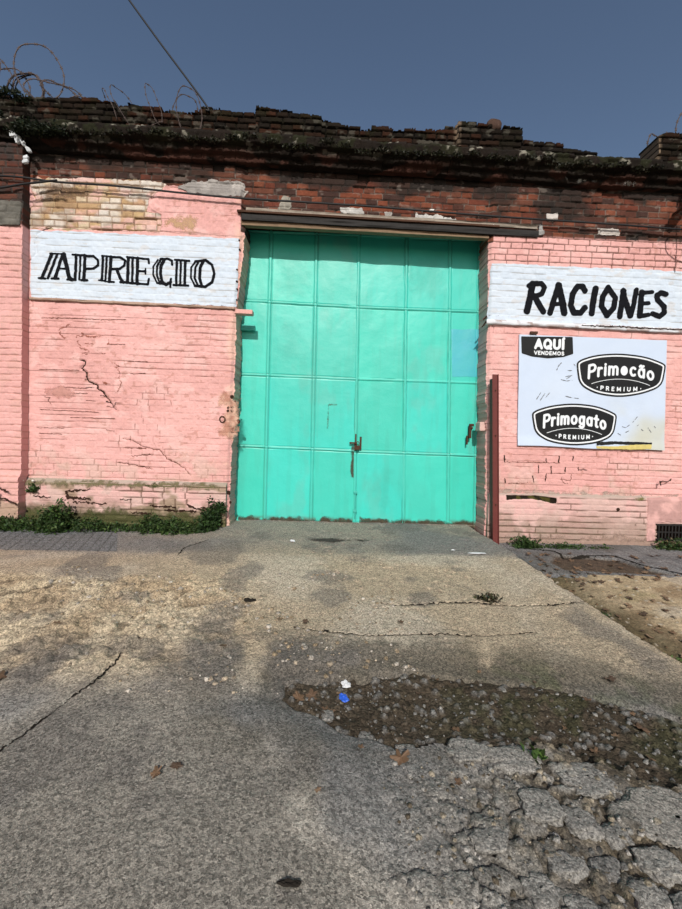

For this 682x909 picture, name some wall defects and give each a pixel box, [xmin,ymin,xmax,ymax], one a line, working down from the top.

flaking render [29,176,166,232]
crack [44,314,126,322]
crack [37,360,189,474]
peeling [219,392,239,441]
crack [0,488,208,515]
crack [0,652,123,751]